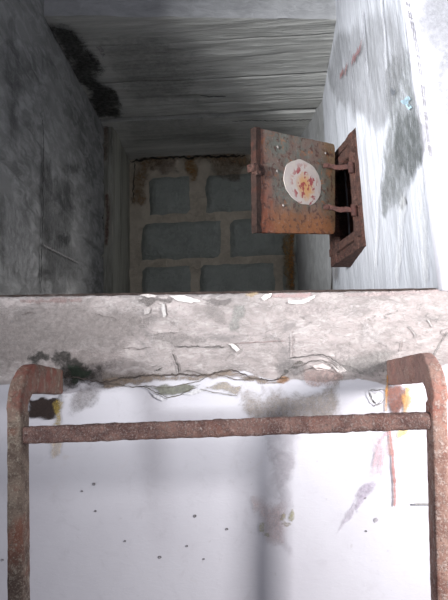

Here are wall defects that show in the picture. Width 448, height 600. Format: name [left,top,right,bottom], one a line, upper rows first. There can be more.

water stain [382,51,444,282]
water stain [0,304,141,407]
crack [65,337,363,388]
peeling [142,382,240,401]
water stain [244,385,337,418]
rust [385,375,411,413]
rust [377,430,407,506]